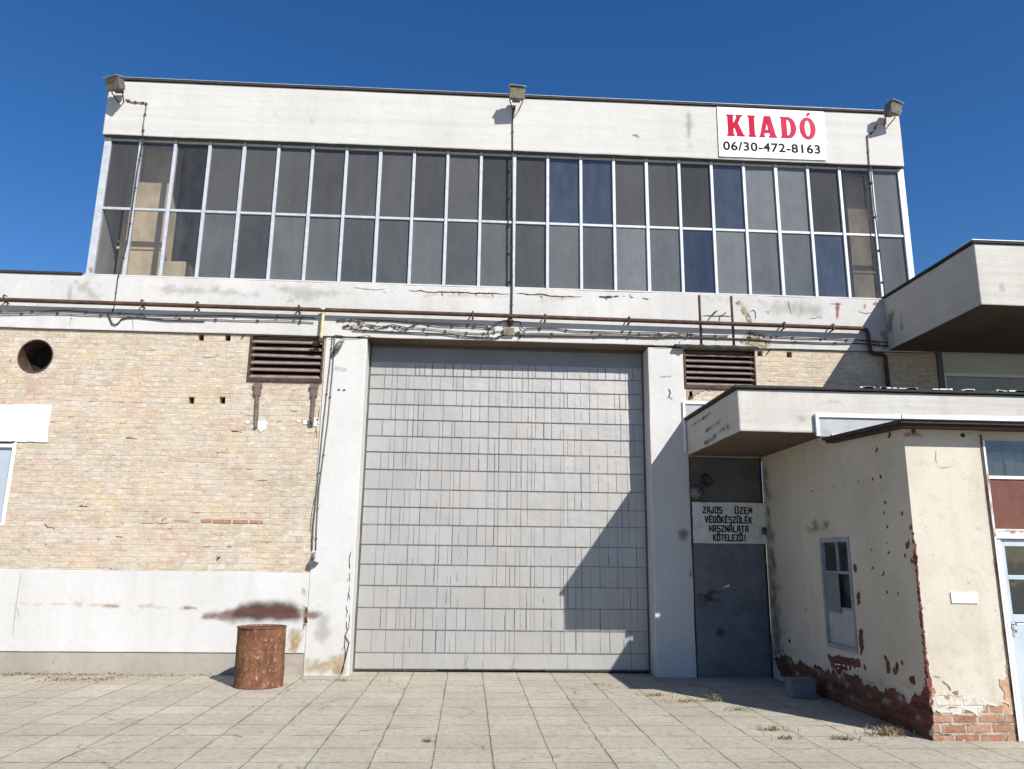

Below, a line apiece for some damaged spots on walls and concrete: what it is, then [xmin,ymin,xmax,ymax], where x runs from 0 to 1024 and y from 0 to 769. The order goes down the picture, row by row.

spalling [736,301,772,348]
rust [204,603,318,620]
leakage [290,631,301,653]
leakage [306,656,344,673]
crack [318,553,351,661]
flaking render [773,511,1017,741]